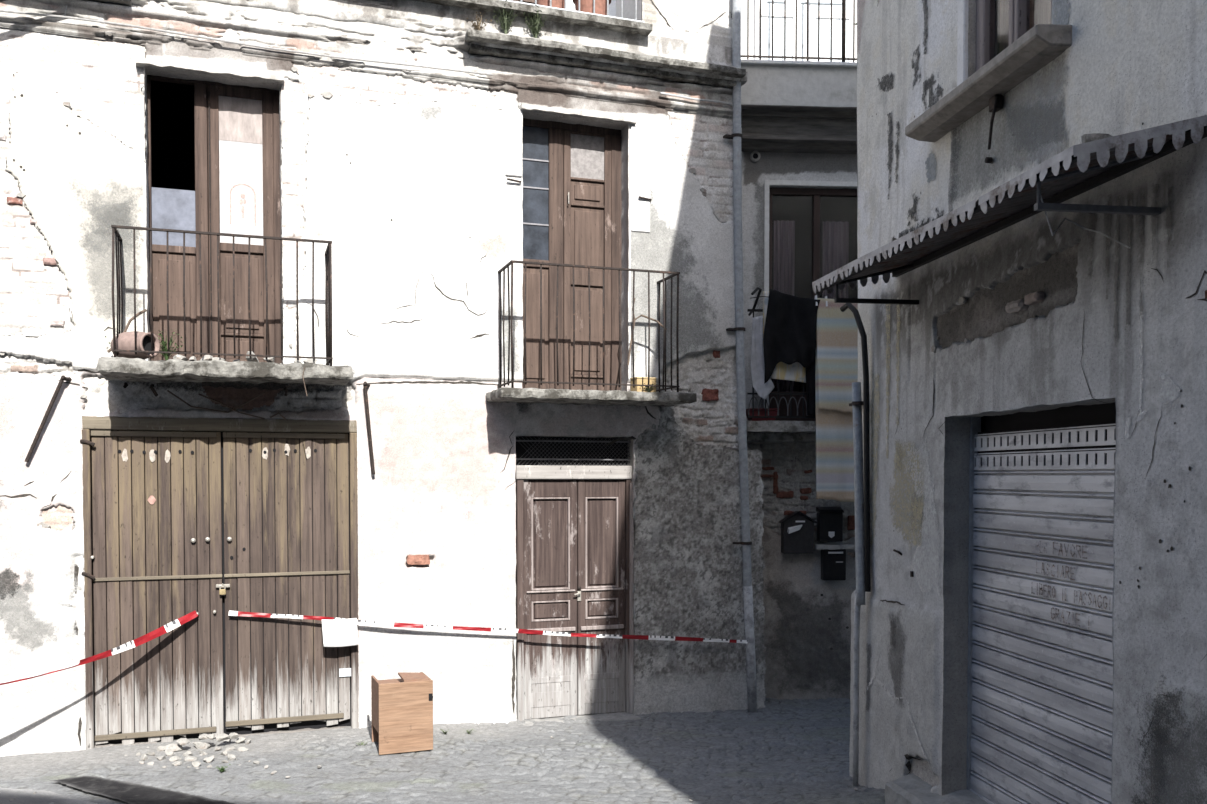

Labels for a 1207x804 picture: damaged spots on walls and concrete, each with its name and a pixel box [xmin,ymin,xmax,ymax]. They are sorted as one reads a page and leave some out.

water stain [877,73,893,92]
water stain [911,0,944,109]
spalling [0,27,146,337]
spalling [281,63,520,353]
spalling [667,107,742,223]
water stain [887,113,899,199]
water stain [891,129,956,242]
crack [306,253,490,338]
spalling [931,243,1079,353]
spalling [0,352,355,413]
spalling [634,346,855,715]
water stain [0,569,51,648]